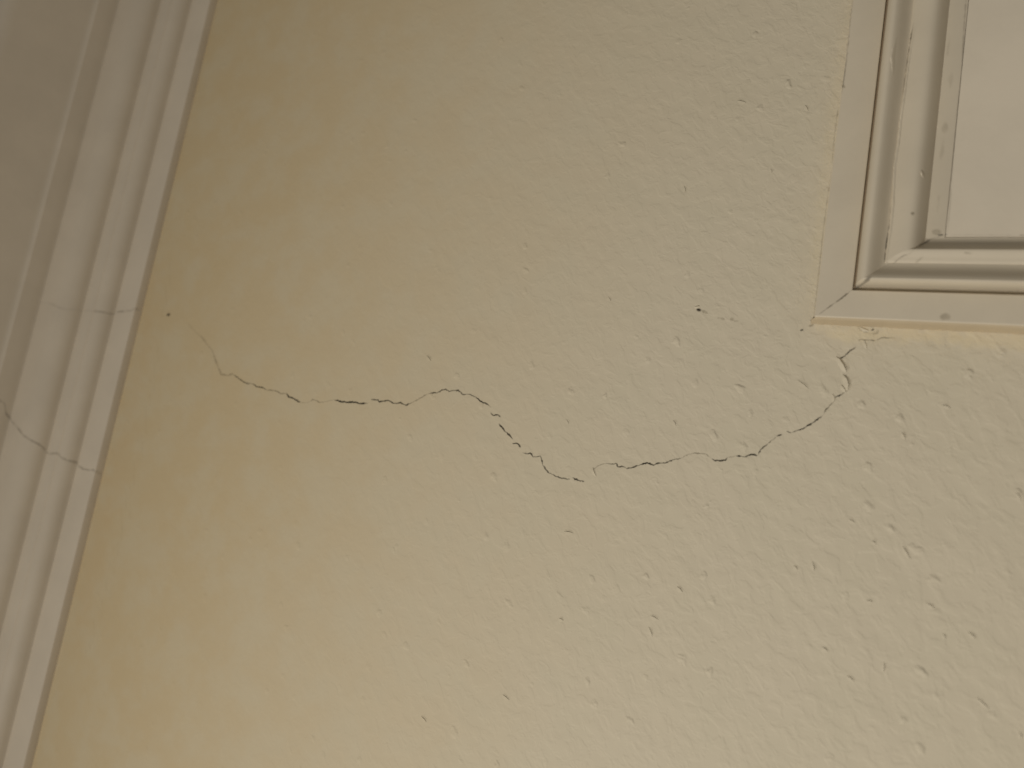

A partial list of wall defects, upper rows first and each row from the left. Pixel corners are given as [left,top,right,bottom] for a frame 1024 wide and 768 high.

crack [336,398,408,406]
crack [433,389,672,482]
crack [714,340,868,461]